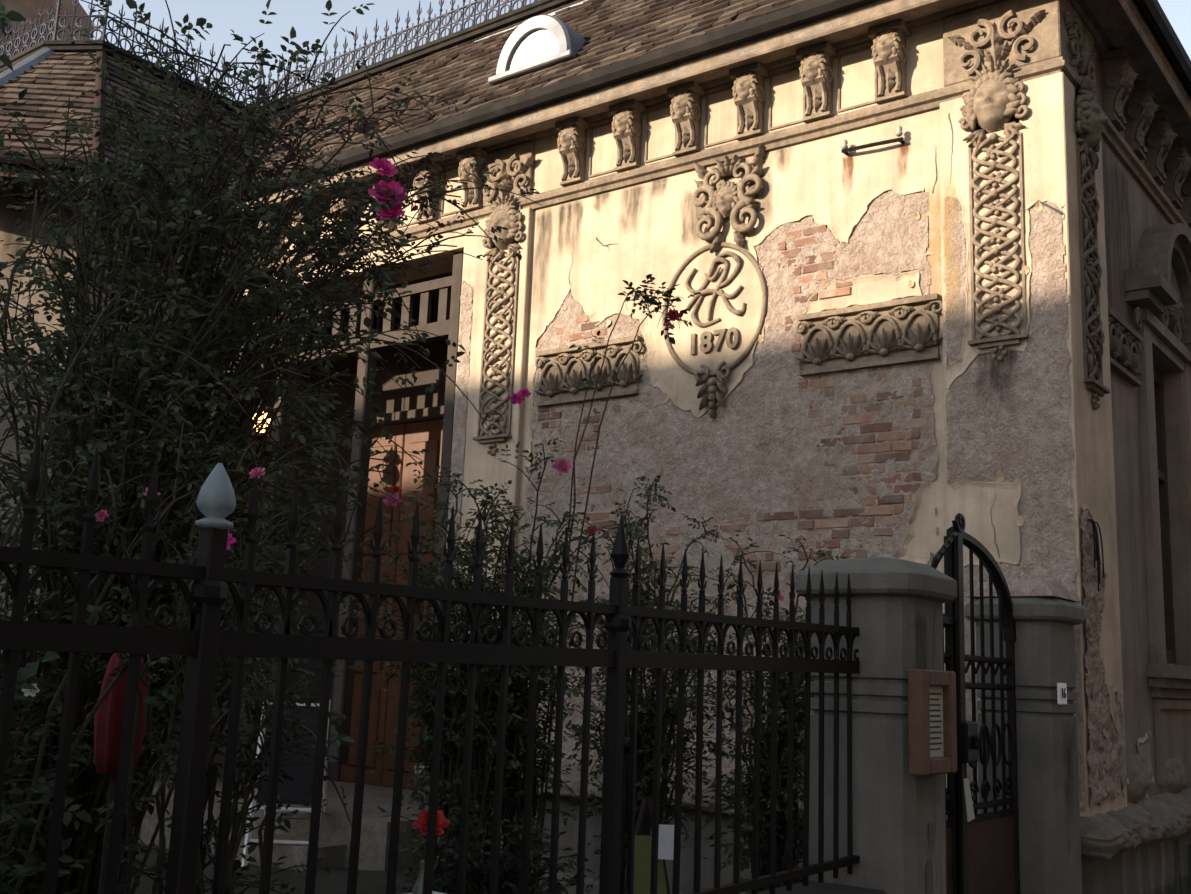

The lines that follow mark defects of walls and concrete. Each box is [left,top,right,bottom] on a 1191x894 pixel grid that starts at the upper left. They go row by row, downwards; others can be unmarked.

flaking render [517,182,1123,811]